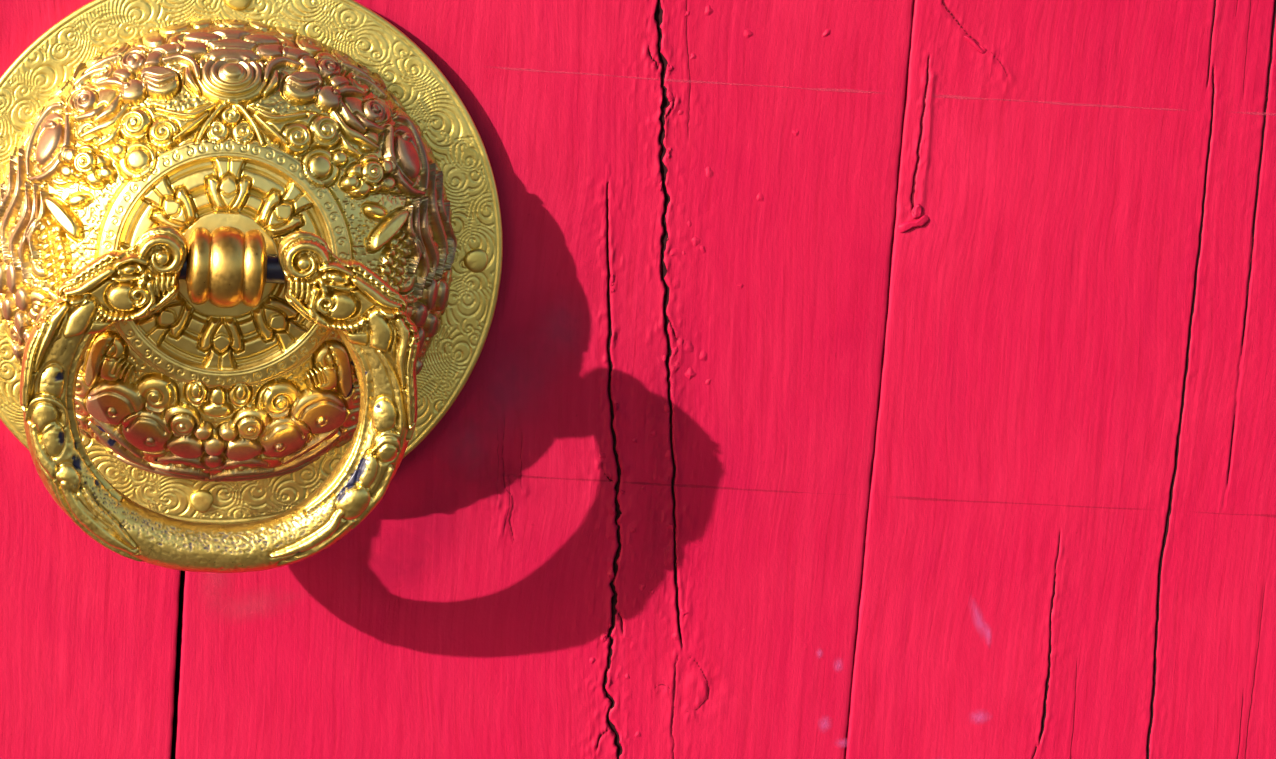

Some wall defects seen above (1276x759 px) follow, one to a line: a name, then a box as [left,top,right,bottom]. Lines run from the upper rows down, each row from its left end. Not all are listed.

crack [597,183,625,759]
crack [649,0,709,759]
crack [1032,535,1077,759]